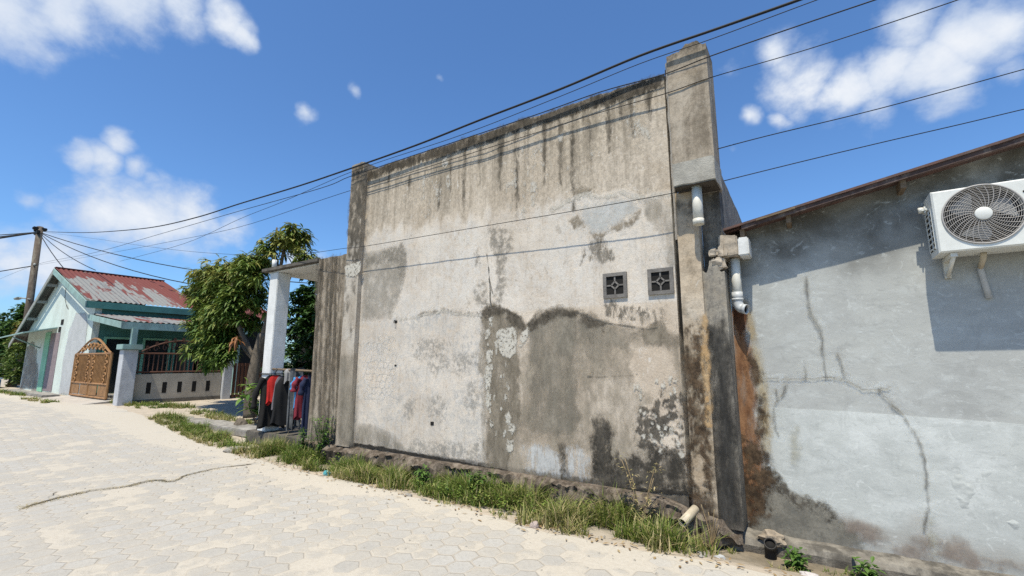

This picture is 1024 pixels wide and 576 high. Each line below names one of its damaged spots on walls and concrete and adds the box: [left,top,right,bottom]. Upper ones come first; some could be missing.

leakage [313,75,663,448]
peeling [484,317,529,452]
flaking render [633,384,707,493]
leakage [476,229,878,548]
rust [732,307,770,519]
crack [805,280,844,372]